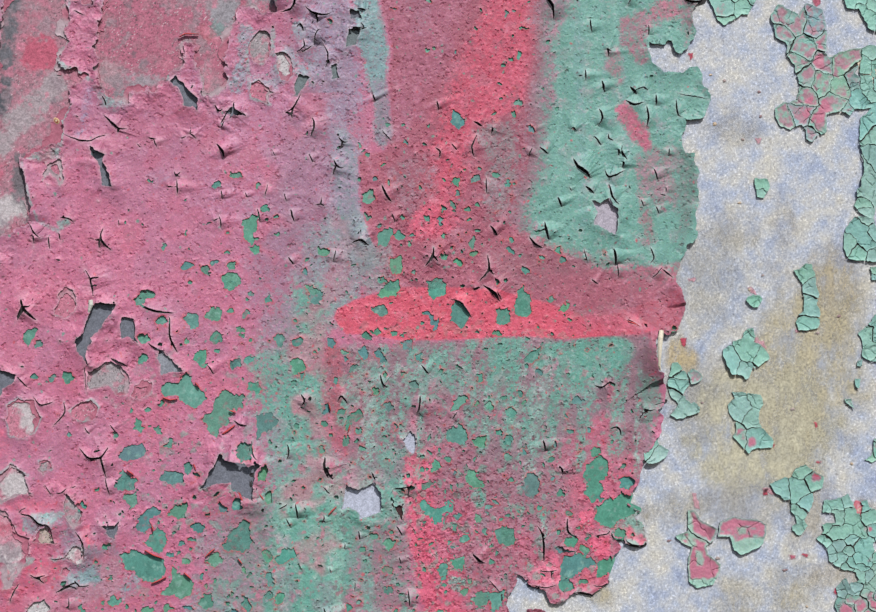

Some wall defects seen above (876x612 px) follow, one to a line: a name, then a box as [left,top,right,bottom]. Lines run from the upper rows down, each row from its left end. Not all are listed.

crack [686,0,706,8]
crack [844,0,876,32]
peeling [0,0,298,245]
peeling [241,204,279,255]
crack [843,83,876,280]
peeling [181,306,224,368]
flaking render [419,0,876,612]
crack [858,314,876,361]
peeling [0,446,90,596]
peeling [30,333,298,612]
crack [816,494,876,612]
crack [865,439,876,462]